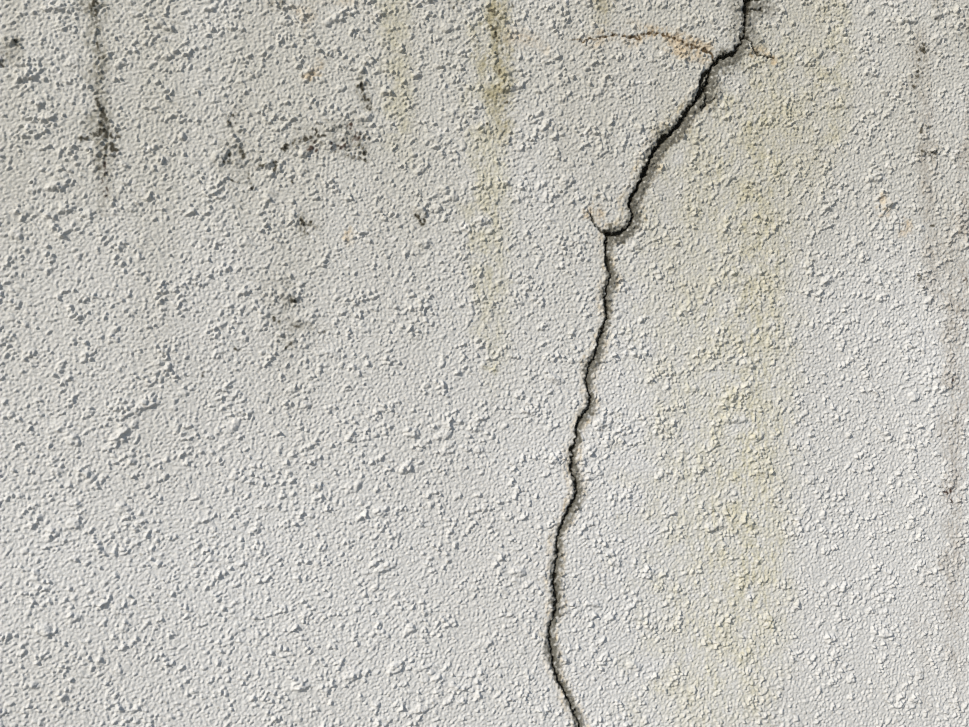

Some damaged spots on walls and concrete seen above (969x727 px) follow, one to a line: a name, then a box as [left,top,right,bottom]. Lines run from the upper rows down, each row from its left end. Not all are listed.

damp [80,103,120,152]
crack [546,0,765,727]